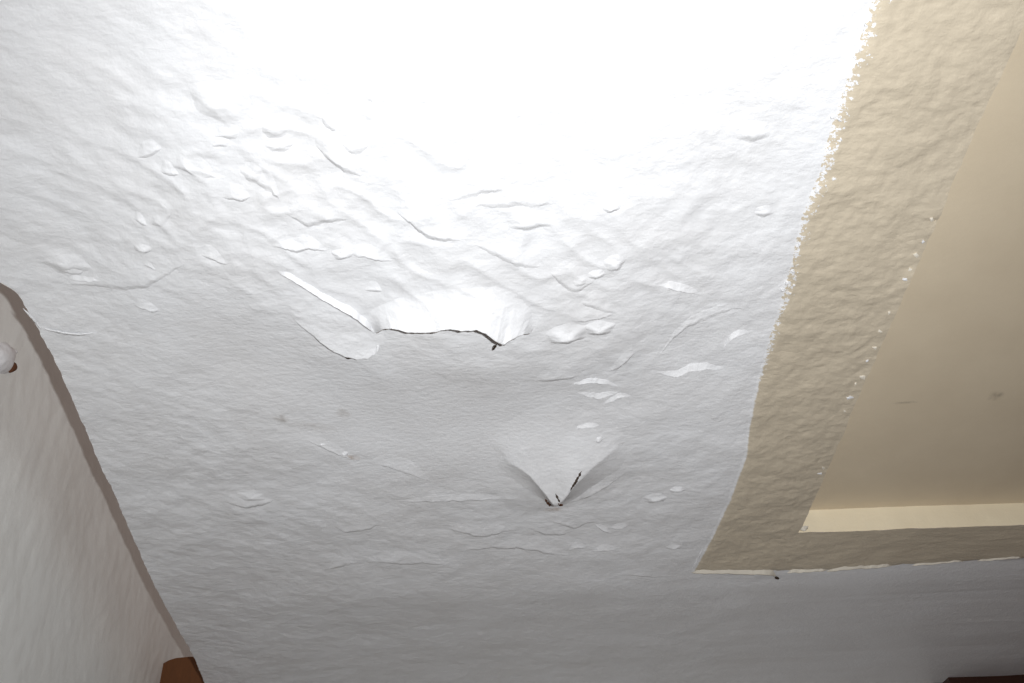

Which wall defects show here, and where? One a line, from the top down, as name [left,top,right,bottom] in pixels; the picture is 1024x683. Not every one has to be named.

peeling [278,271,534,360]
peeling [692,564,892,576]